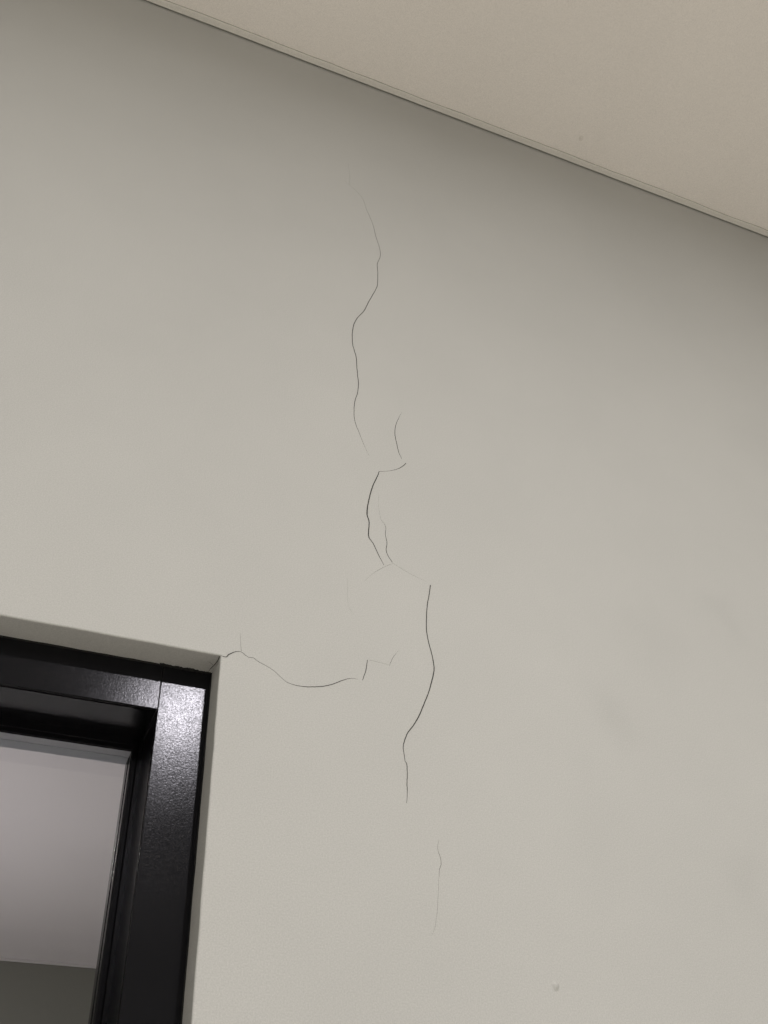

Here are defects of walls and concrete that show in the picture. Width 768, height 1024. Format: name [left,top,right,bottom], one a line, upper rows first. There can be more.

crack [207,633,399,688]
crack [347,164,435,803]